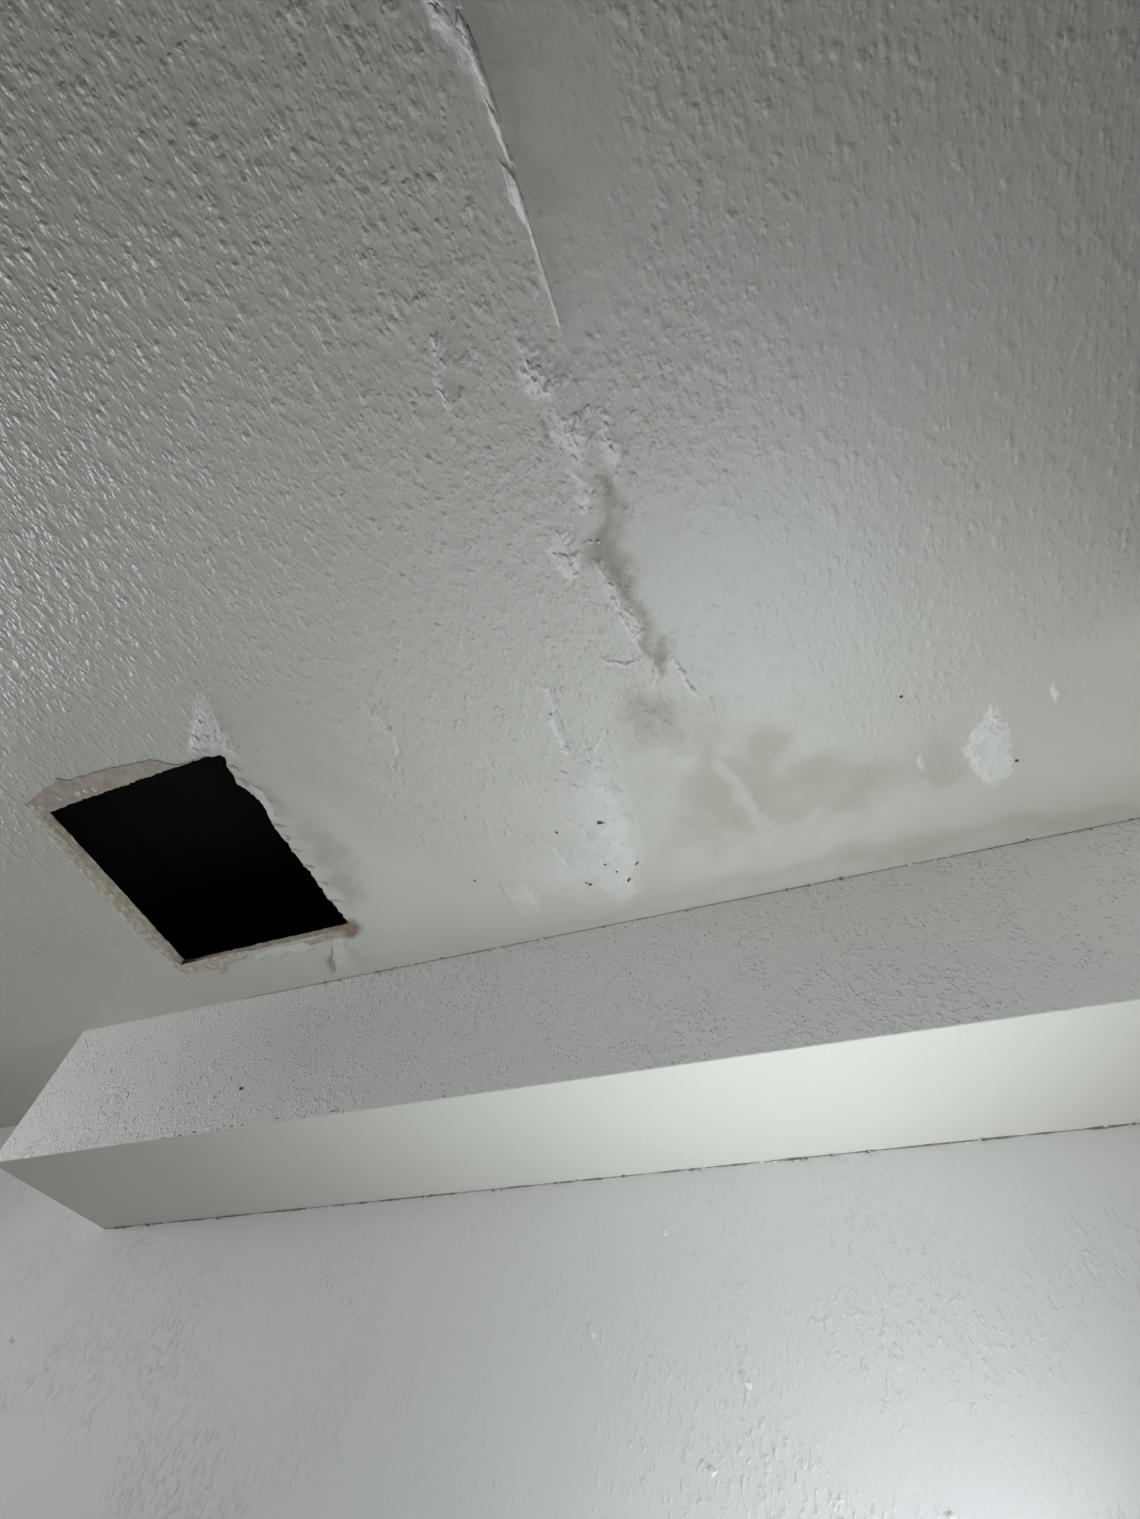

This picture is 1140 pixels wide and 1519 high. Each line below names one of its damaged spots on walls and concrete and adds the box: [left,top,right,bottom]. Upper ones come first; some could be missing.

crack [452,3,564,337]
peeling [544,524,644,640]
peeling [959,699,1015,793]